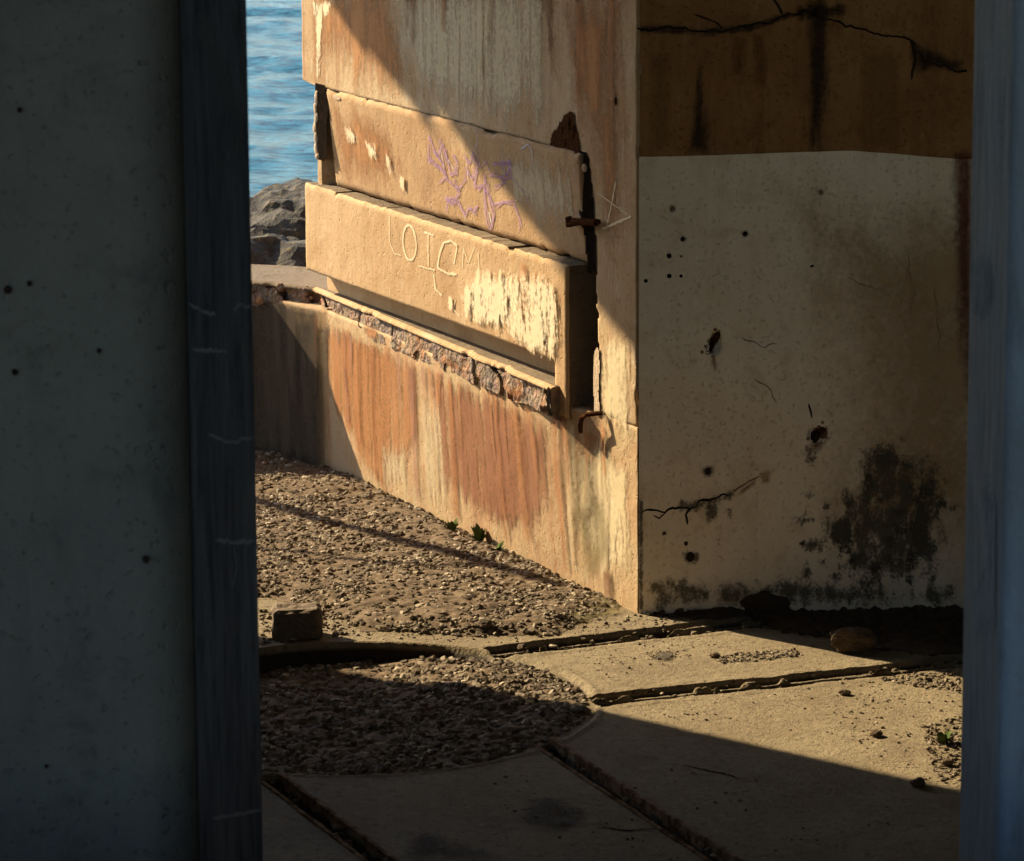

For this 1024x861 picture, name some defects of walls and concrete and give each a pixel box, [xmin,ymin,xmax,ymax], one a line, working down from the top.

crack [637,0,967,81]
water stain [798,1,844,146]
spalling [550,111,579,153]
peeling [448,268,558,359]
hole [700,328,721,368]
corrosion [327,327,569,568]
water stain [568,233,970,610]
hole [806,404,828,450]
crack [643,476,759,525]